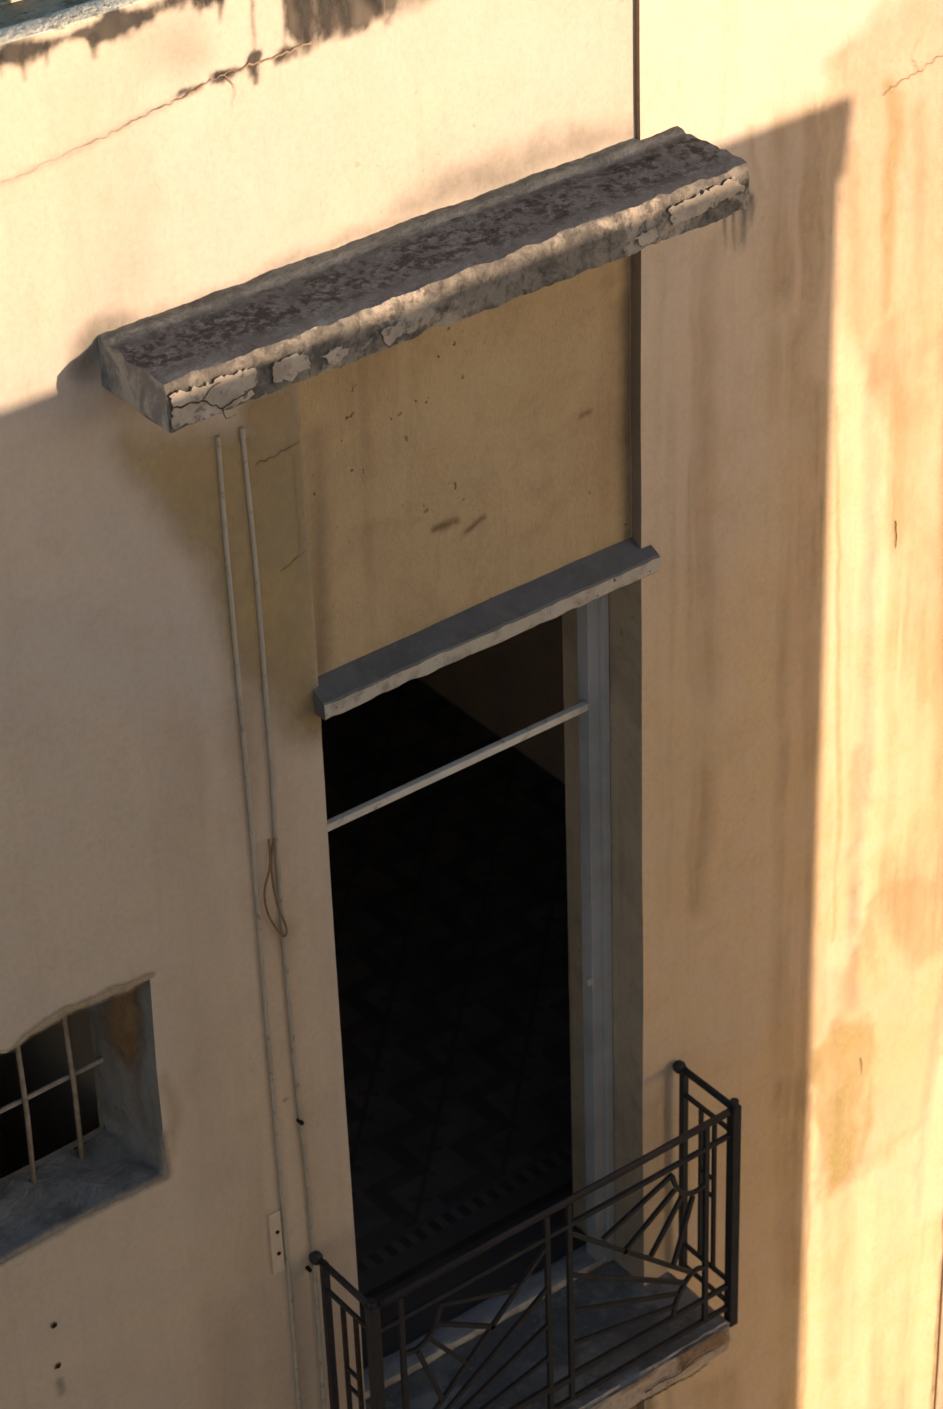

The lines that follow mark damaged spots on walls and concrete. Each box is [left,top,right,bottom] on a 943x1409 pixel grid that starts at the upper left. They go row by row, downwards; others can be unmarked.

damp [0,0,223,65]
damp [285,0,397,44]
crack [1,42,312,183]
flaking render [381,321,406,346]
flaking render [169,346,349,429]